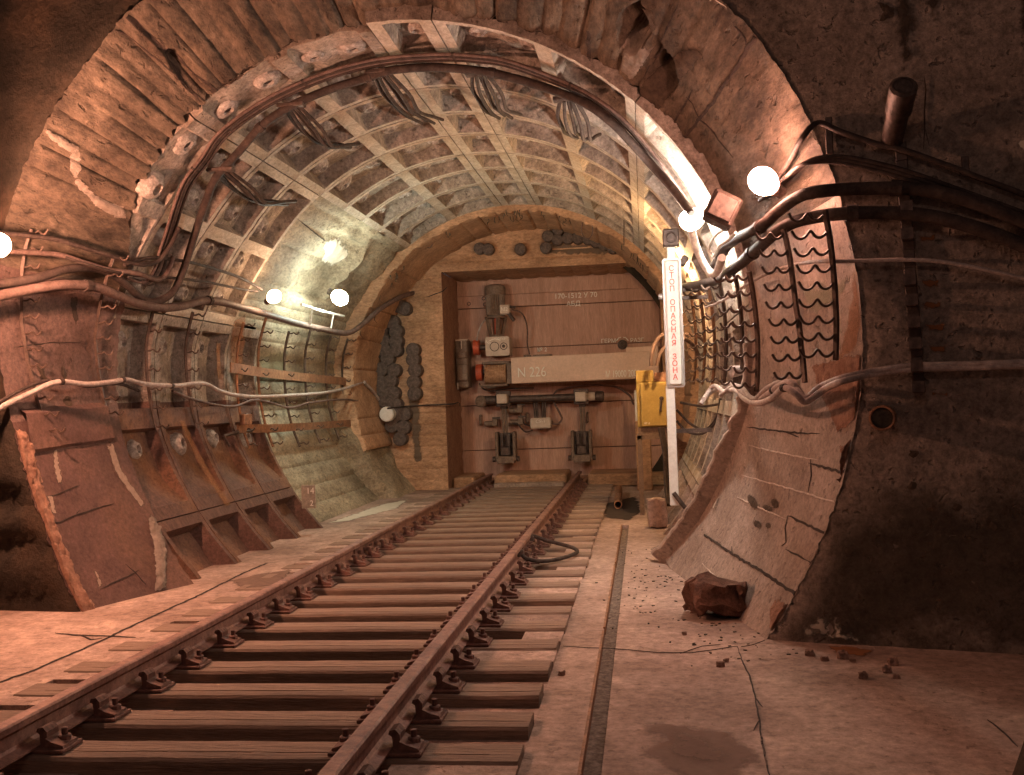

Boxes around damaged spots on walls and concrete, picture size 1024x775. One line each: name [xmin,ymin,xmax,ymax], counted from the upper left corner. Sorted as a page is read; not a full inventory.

spalling [618,4,703,110]
crack [748,427,820,437]
crack [808,459,845,491]
crack [47,485,114,523]
crack [703,534,797,596]
crack [781,515,824,563]
crack [566,628,774,775]
damp [644,723,757,775]